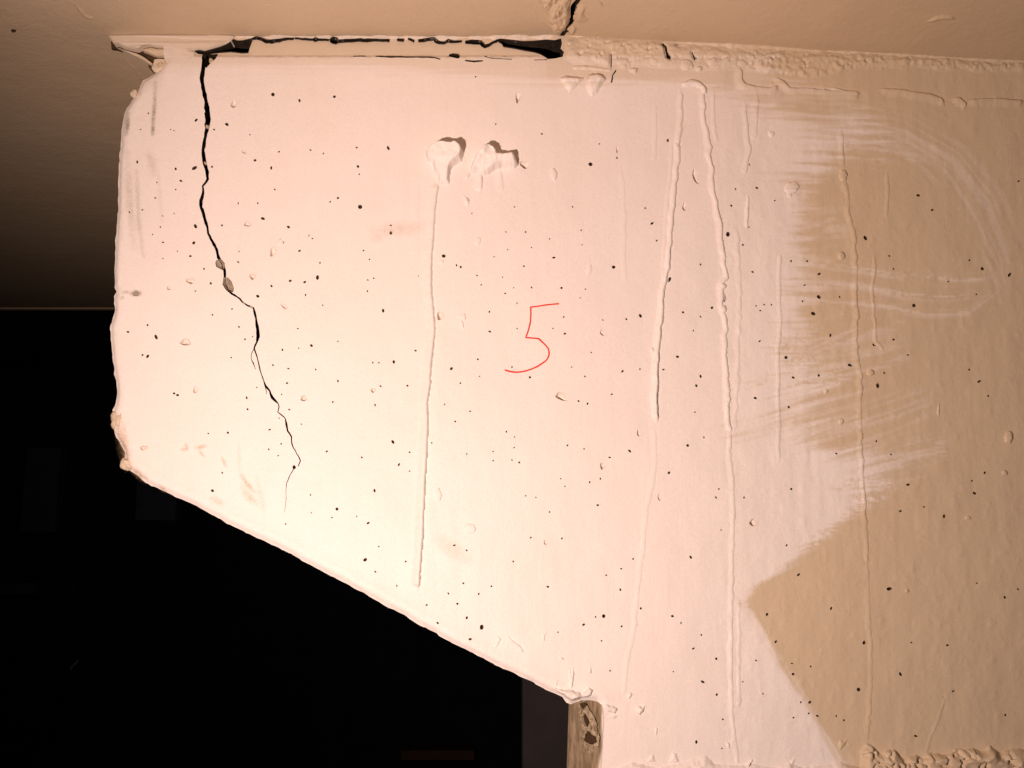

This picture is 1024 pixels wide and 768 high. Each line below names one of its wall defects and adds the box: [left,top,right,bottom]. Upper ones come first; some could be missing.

crack [195,0,588,507]
spalling [552,655,619,755]